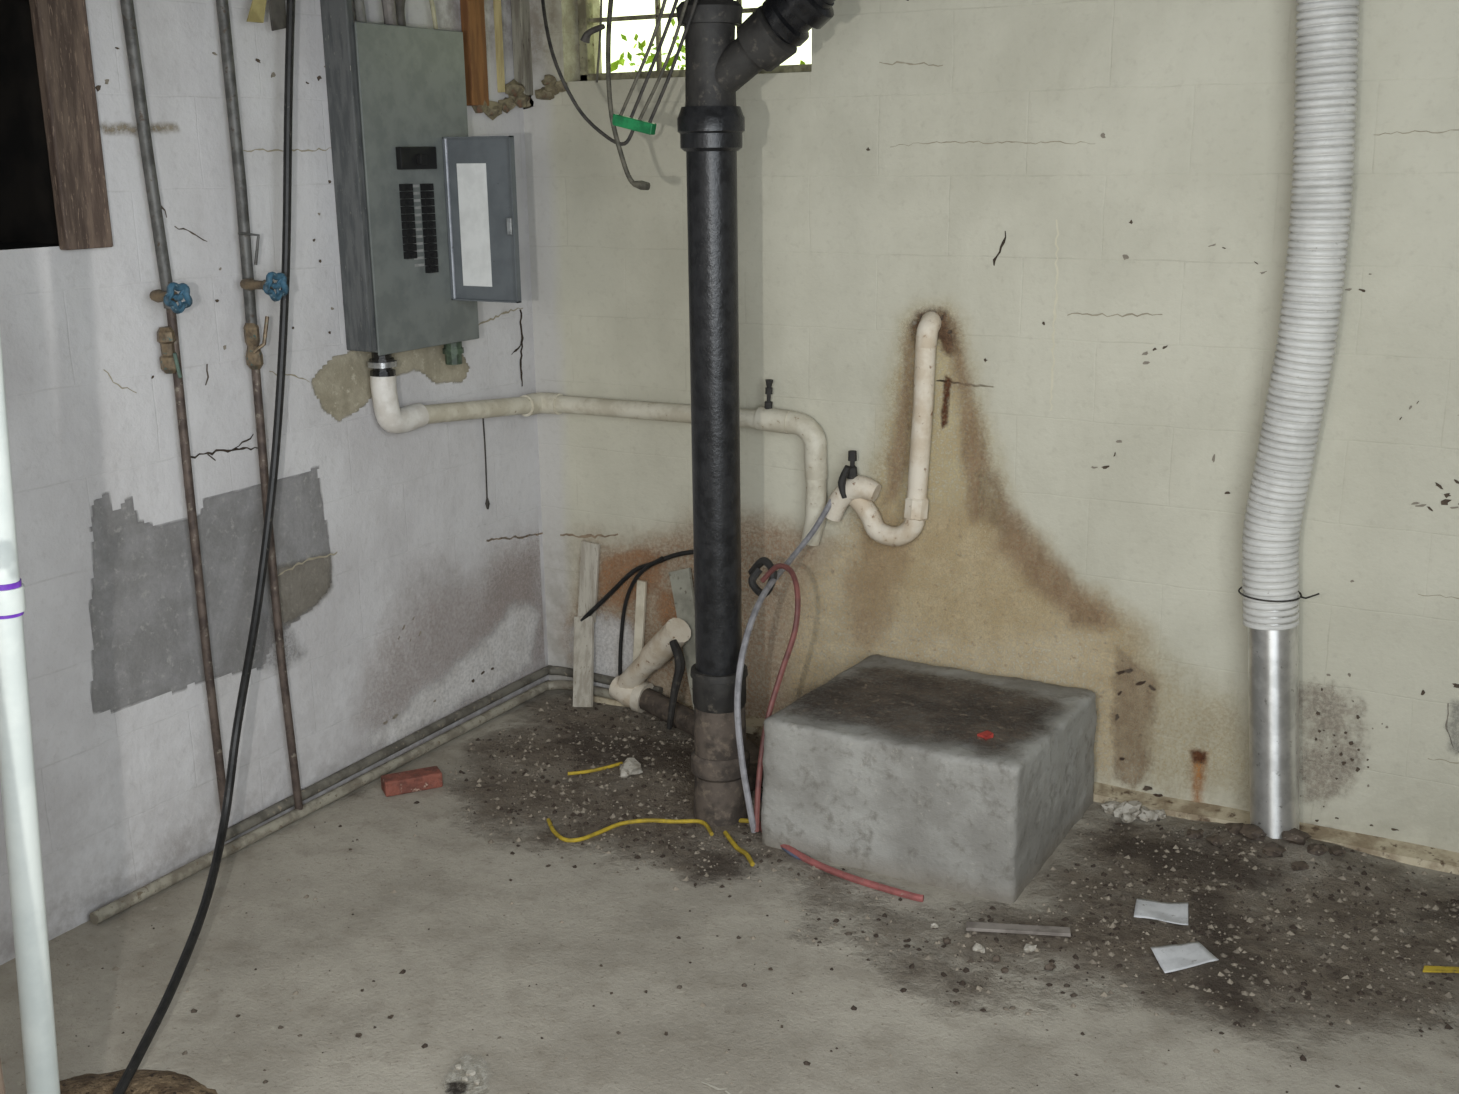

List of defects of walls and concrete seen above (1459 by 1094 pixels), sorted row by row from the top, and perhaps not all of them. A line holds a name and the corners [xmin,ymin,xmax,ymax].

flaking render [269,351,373,421]
flaking render [391,345,470,384]
water stain [741,313,1138,771]
peeling [89,467,337,712]
water stain [593,537,694,689]
corrosion [1193,751,1205,800]
water stain [1312,701,1388,787]